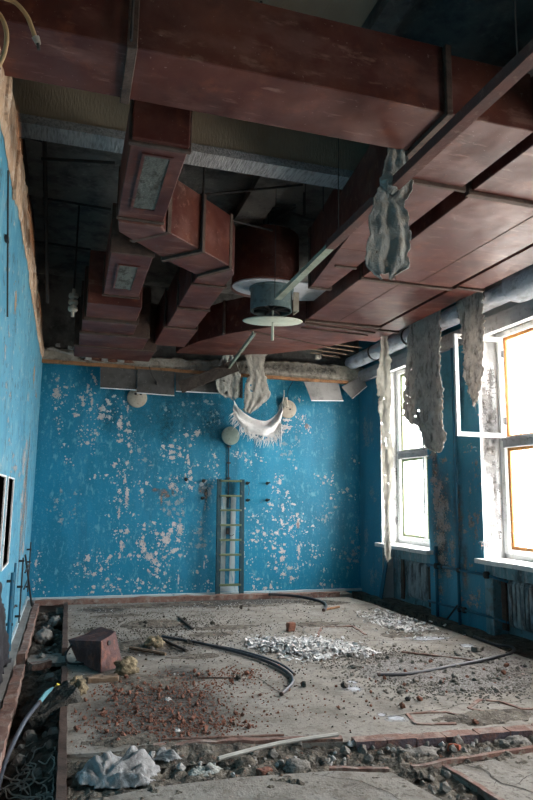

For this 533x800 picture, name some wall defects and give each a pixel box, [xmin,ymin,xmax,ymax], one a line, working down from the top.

flaking render [0,48,221,595]
peeling [276,415,312,473]
damp [482,388,497,515]
peeling [244,471,370,591]